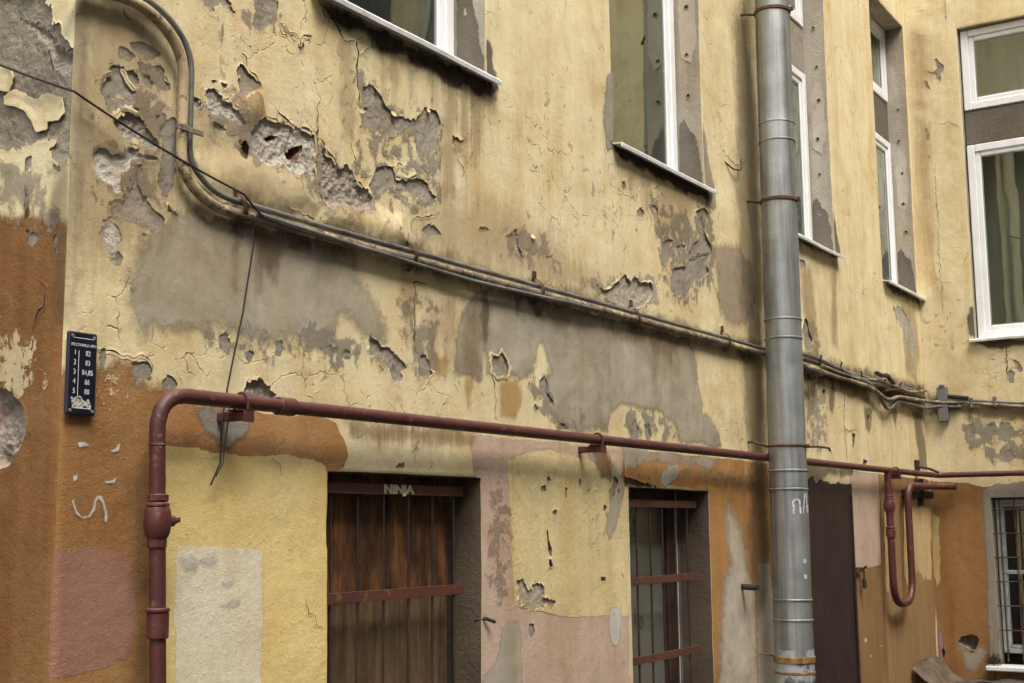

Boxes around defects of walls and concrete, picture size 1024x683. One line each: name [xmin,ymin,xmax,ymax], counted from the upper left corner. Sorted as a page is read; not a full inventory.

crack [272,8,374,109]
flaking render [0,0,74,256]
peeling [88,41,185,266]
flaking render [193,56,466,239]
peeling [580,183,719,315]
flaking render [0,320,50,475]
damp [351,420,474,442]
peeling [488,348,512,380]
peeling [526,372,583,432]
peeling [622,406,681,442]
peeling [956,411,1024,464]
peeling [488,466,583,637]